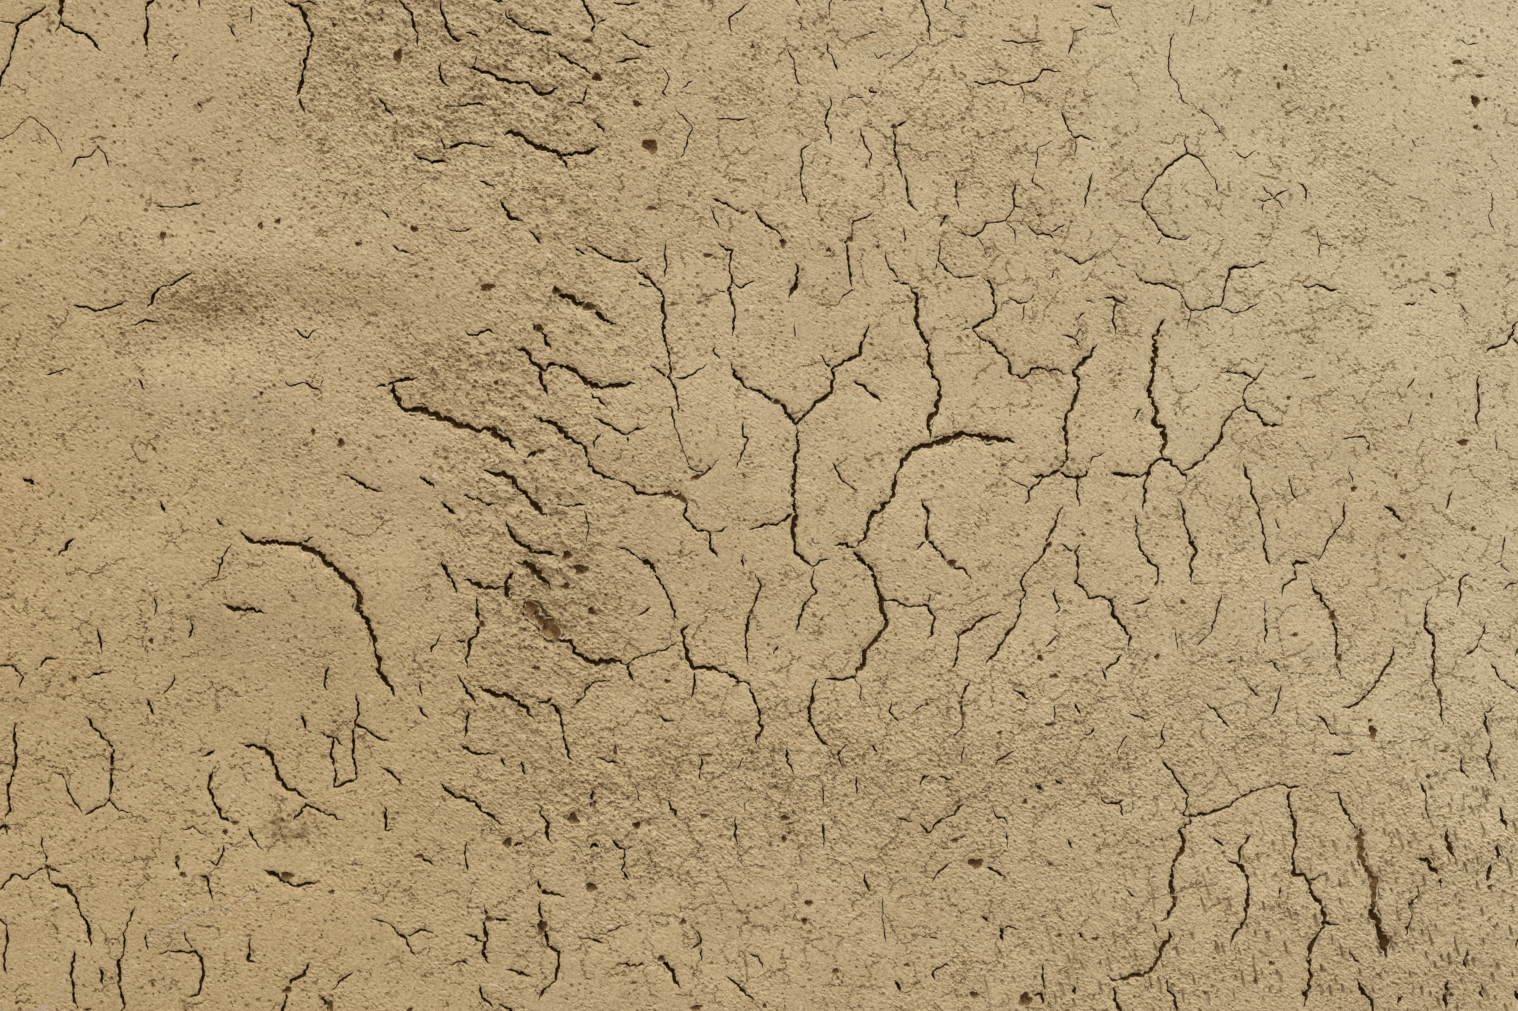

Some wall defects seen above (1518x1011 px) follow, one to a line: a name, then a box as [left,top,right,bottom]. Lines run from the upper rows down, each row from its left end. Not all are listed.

crack [141,0,180,64]
crack [1404,287,1468,313]
crack [1473,319,1518,451]
crack [152,0,1396,903]
crack [1383,504,1403,523]
crack [1012,536,1518,1011]
crack [0,628,207,1011]
crack [244,936,355,1011]
crack [370,879,765,1011]
crack [861,871,888,942]
crack [894,935,952,992]
crack [981,915,1020,941]